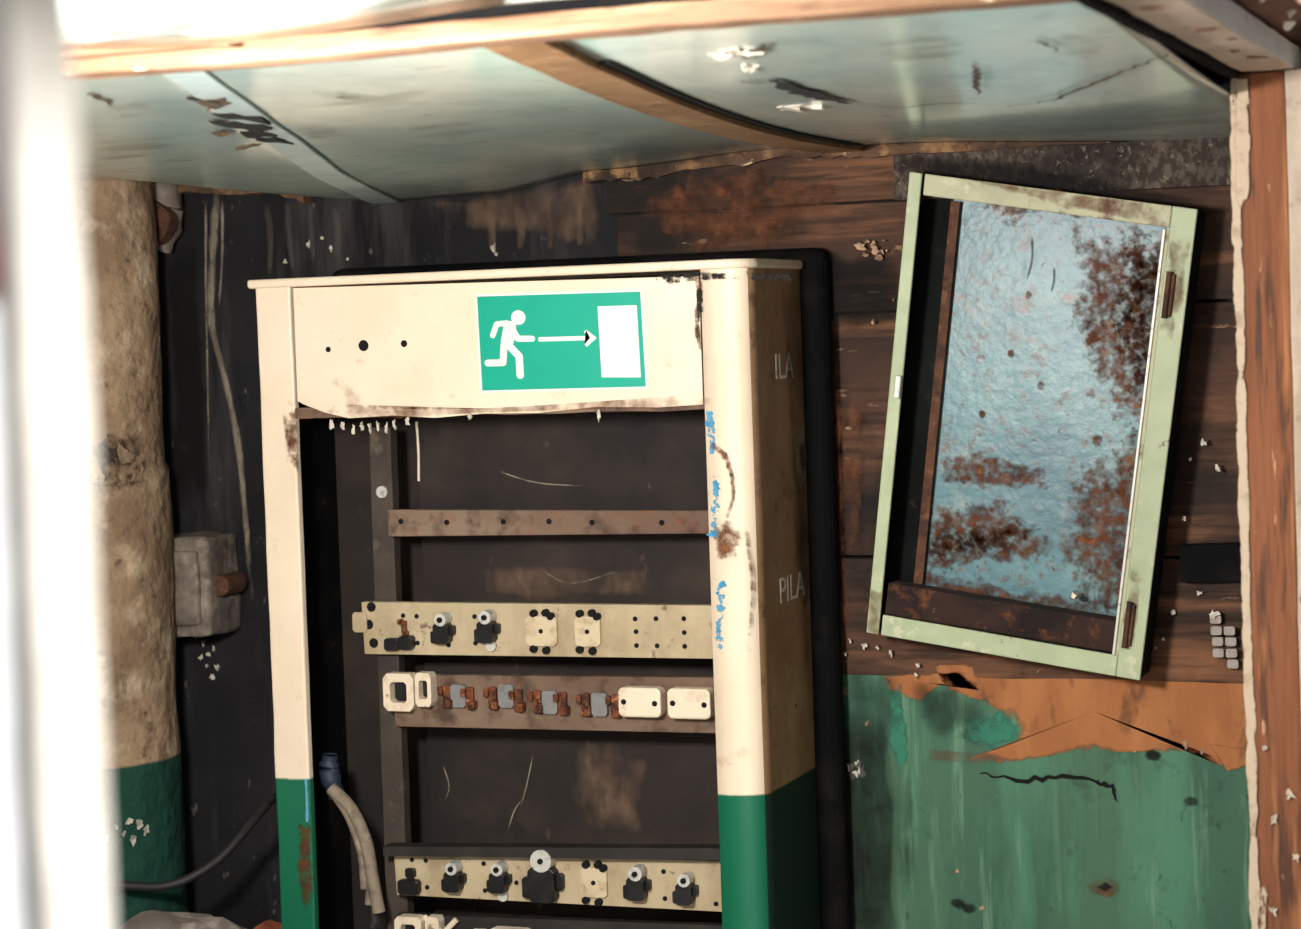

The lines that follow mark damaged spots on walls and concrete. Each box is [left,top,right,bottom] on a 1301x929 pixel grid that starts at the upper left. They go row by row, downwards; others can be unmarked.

peeling [1283,0,1301,31]
peeling [854,239,888,261]
peeling [883,78,1278,929]
crack [980,772,1118,802]